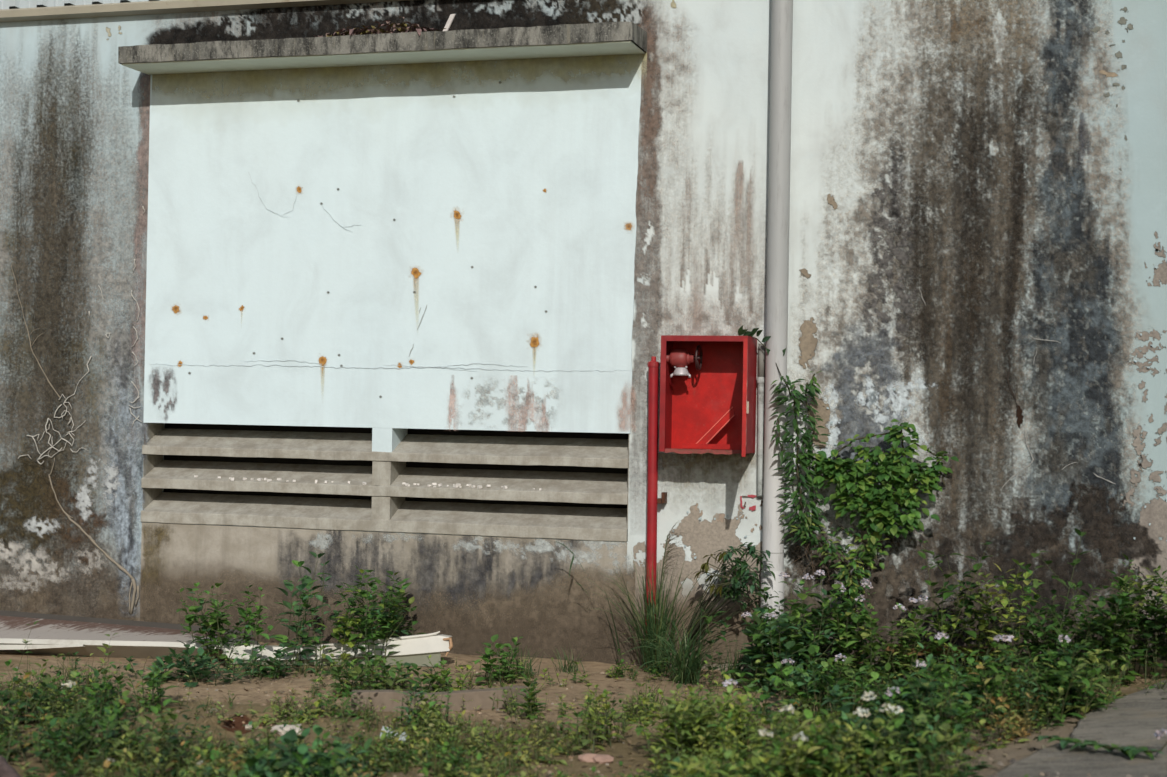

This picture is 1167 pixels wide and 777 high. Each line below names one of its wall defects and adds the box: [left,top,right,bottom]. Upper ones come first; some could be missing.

damp [0,36,177,587]
damp [149,0,765,455]
peeling [633,503,763,664]
damp [658,453,754,483]
peeling [799,317,818,369]
damp [790,0,1162,670]
peeling [1120,329,1167,619]
peeling [1144,231,1167,288]